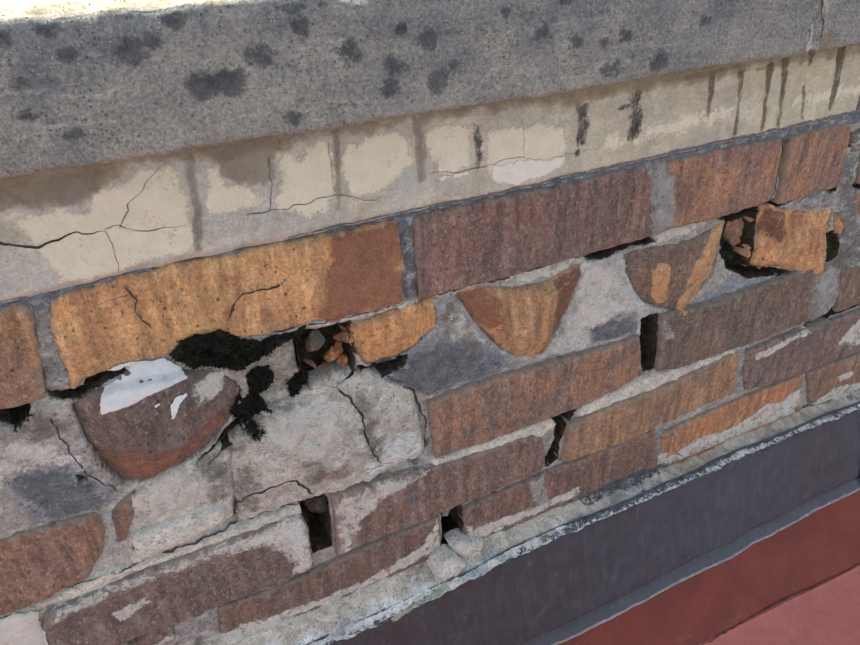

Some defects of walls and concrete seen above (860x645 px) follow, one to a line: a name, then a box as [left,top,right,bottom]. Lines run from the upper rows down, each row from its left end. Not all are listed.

water stain [520,29,855,135]
water stain [175,135,294,184]
crack [248,143,379,215]
crack [0,168,180,328]
spalling [13,164,437,479]
spalling [455,199,846,371]
crack [50,418,118,492]
crack [335,386,410,471]
peeling [545,409,576,466]
peeling [299,496,332,553]
peeling [441,505,464,545]